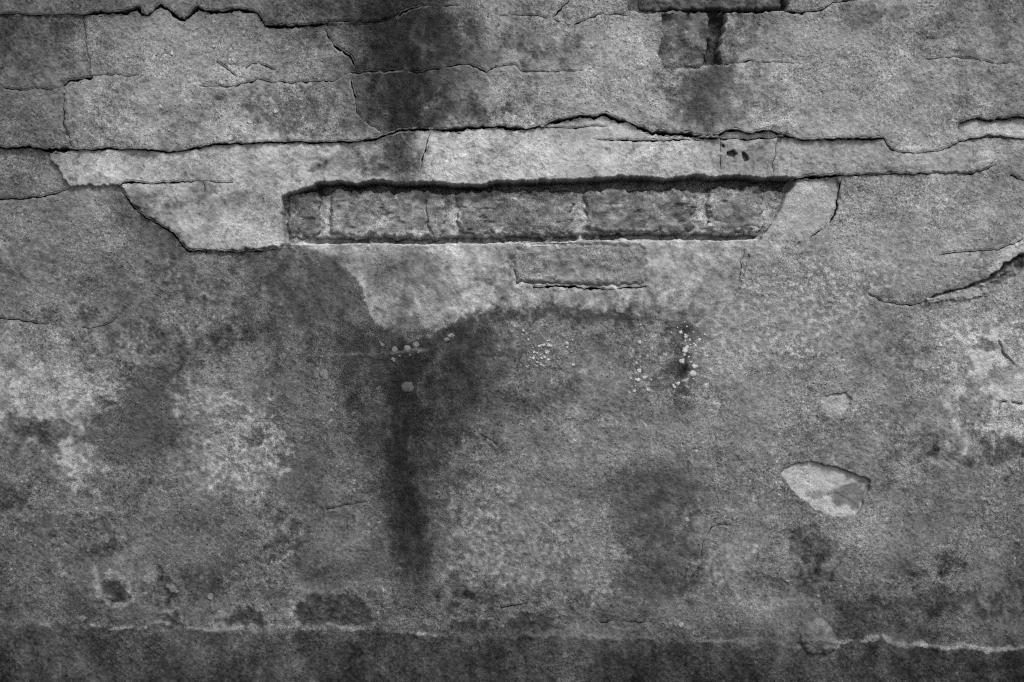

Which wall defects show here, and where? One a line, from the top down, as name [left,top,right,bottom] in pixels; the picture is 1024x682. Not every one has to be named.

leakage [352,0,451,162]
crack [0,0,1024,238]
crack [119,179,282,254]
flaking render [50,118,1024,342]
crack [868,293,931,308]
leakage [321,312,507,569]
spalling [781,462,869,517]